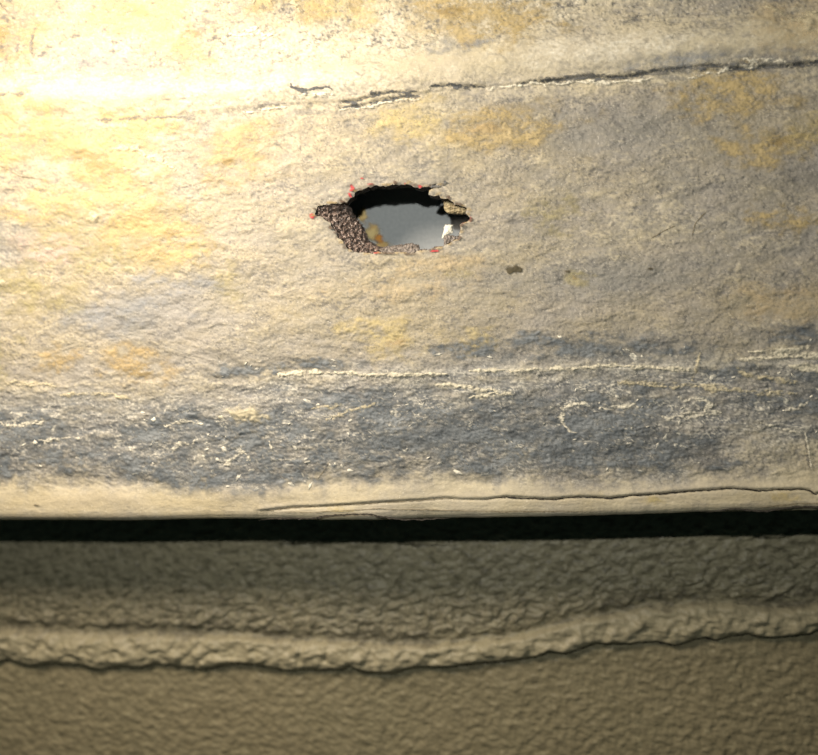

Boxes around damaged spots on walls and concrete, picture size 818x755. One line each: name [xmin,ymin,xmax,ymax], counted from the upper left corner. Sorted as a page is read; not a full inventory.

crack [521,59,818,85]
crack [254,83,486,109]
crack [97,114,192,122]
crack [763,423,812,469]
crack [257,488,818,521]
crack [465,634,759,665]